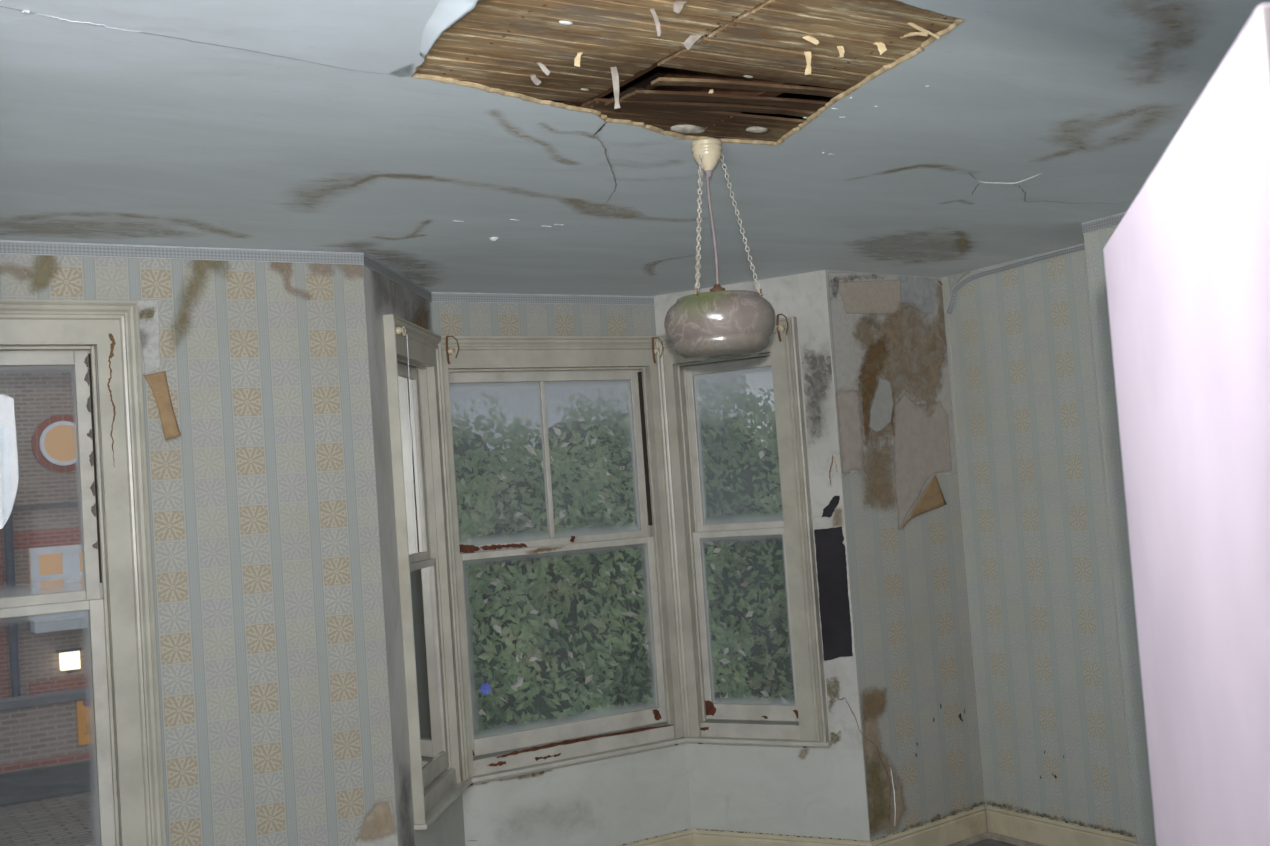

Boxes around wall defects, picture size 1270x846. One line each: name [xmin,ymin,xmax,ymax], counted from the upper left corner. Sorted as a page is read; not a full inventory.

crack [0,6,382,74]
flaking render [411,0,964,145]
crack [577,122,617,207]
water stain [0,255,54,288]
water stain [176,260,222,334]
water stain [274,262,309,298]
water stain [313,244,427,329]
crack [107,333,116,468]
water stain [805,355,832,420]
flaking render [828,244,1085,529]
water stain [863,690,906,832]
flaking render [355,798,398,846]